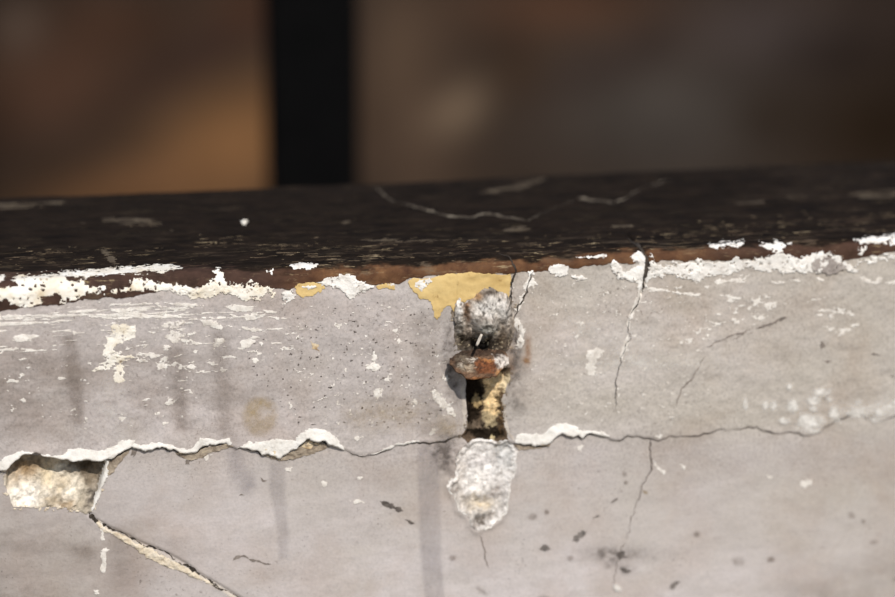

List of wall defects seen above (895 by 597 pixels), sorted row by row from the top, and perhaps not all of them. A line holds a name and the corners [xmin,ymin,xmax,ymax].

crack [89,513,239,597]
crack [0,428,454,476]
spalling [0,237,518,531]
crack [615,236,650,408]
crack [512,415,895,577]
crack [675,317,787,409]